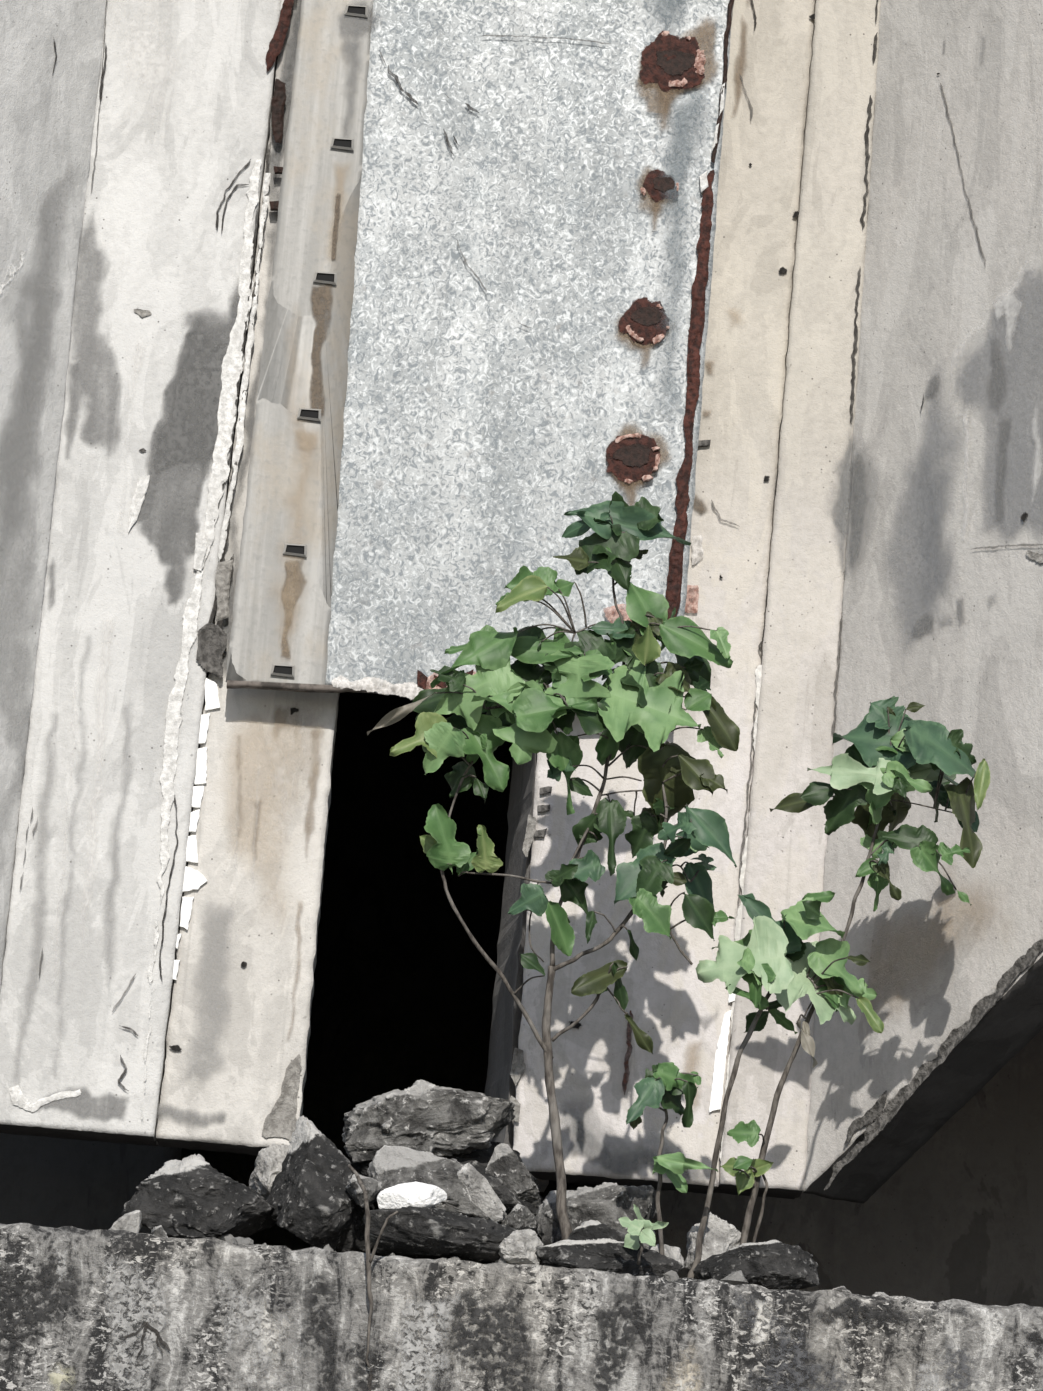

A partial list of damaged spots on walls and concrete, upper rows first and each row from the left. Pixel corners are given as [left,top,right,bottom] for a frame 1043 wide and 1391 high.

corrosion [606,0,745,620]
water stain [137,292,240,602]
flaking render [128,475,150,533]
flaking render [144,159,270,1093]
corrosion [604,604,632,623]
water stain [0,1249,81,1350]
water stain [103,1262,167,1391]
water stain [217,1273,277,1365]
water stain [298,1275,374,1391]
water stain [397,1289,537,1391]
water stain [593,1286,639,1391]
water stain [816,1297,968,1329]